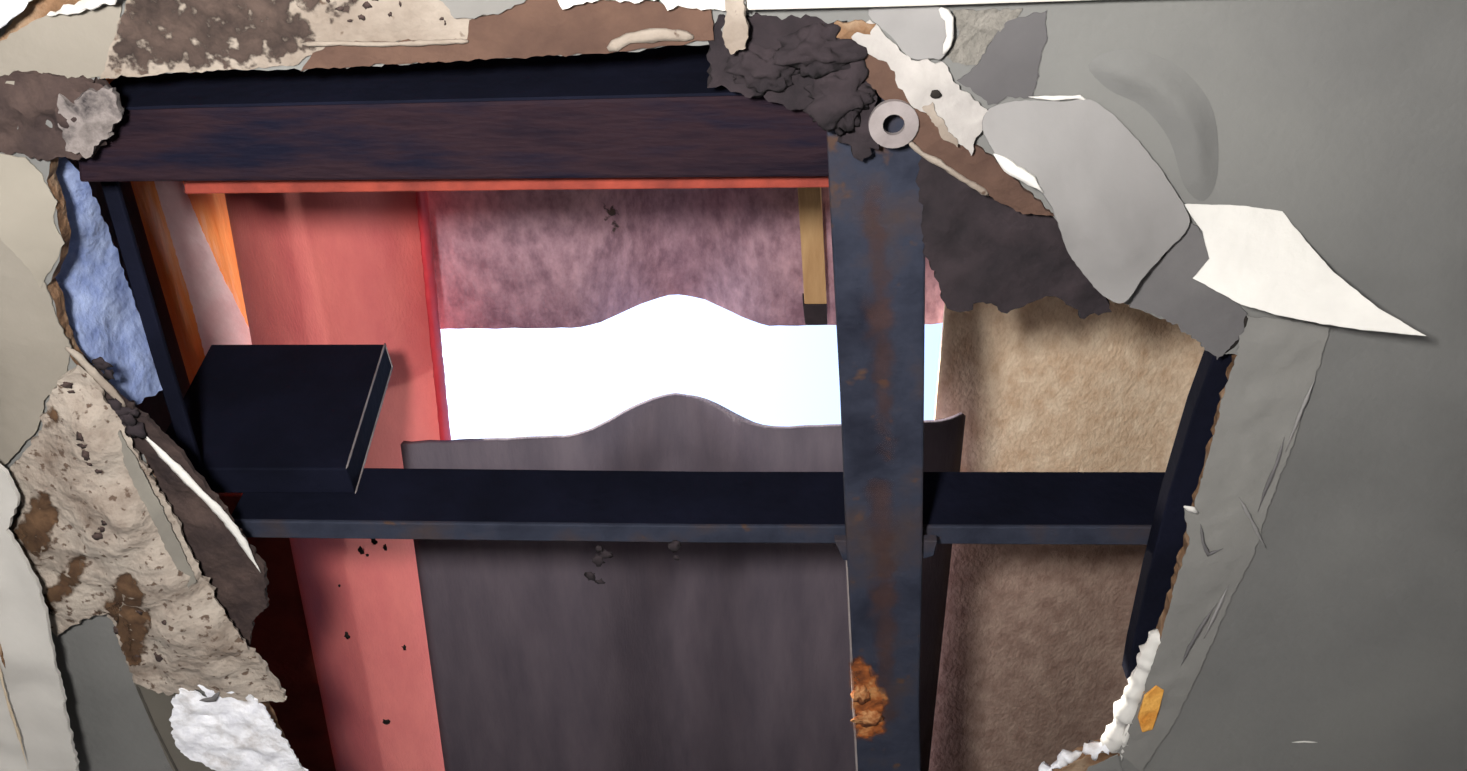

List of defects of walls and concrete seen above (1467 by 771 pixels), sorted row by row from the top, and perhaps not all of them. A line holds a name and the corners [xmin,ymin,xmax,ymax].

flaking render [100,0,525,79]
peeling [616,0,725,11]
peeling [868,6,1023,65]
peeling [982,95,1426,353]
peeling [154,181,252,356]
damp [13,492,59,556]
damp [91,520,107,540]
damp [44,556,86,615]
damp [96,573,166,666]
flaking render [169,685,309,771]
corrosion [850,657,888,739]
spalling [1038,628,1161,771]